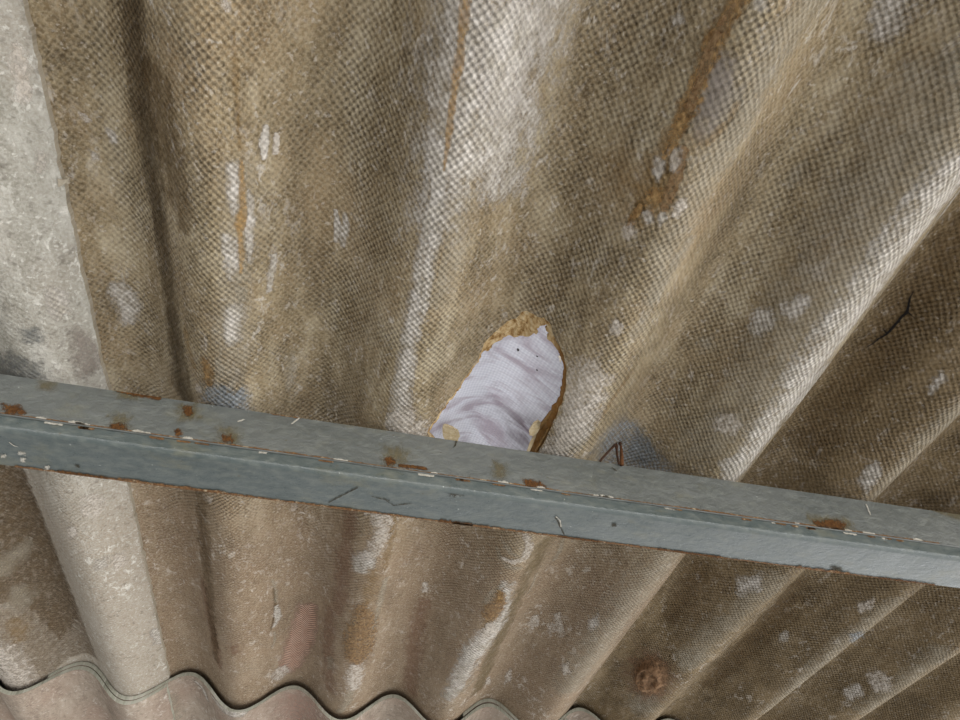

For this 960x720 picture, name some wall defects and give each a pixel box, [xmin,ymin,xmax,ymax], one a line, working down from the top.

rust [443,0,472,169]
rust [627,0,749,230]
hole [427,311,567,453]
crack [866,291,914,348]
rust [0,403,940,544]
rust [14,465,936,586]